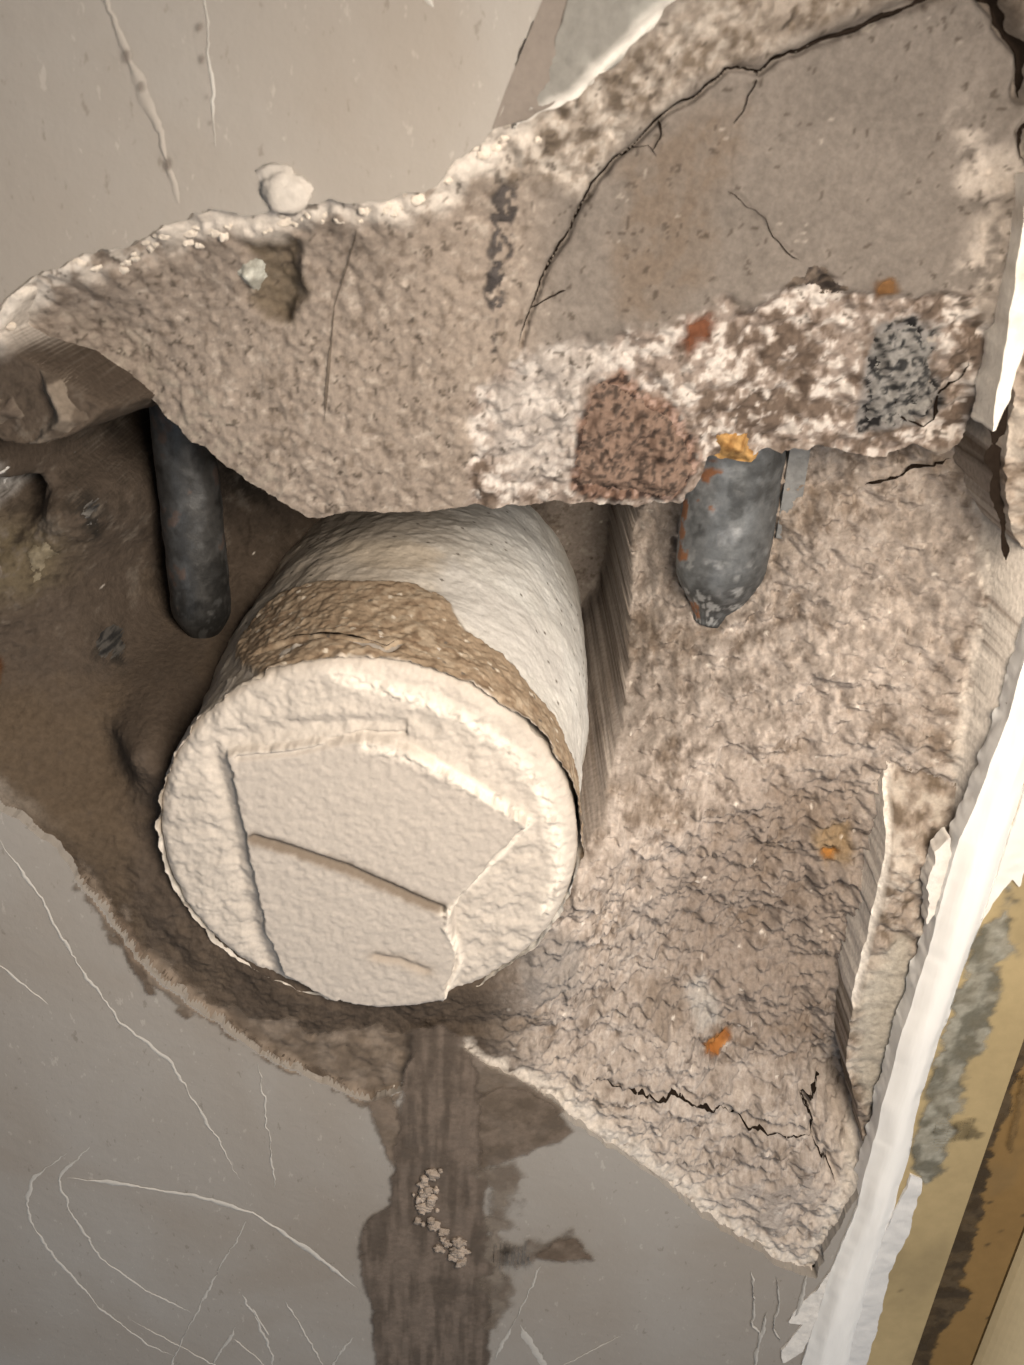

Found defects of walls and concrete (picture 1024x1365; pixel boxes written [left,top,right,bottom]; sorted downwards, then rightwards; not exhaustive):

flaking render [492,0,674,129]
crack [519,0,926,343]
crack [976,0,1024,159]
flaking render [971,172,1024,431]
spalling [0,275,1024,1270]
leakage [75,863,593,1365]
crack [591,1071,835,1181]
corrosion [704,1028,730,1055]